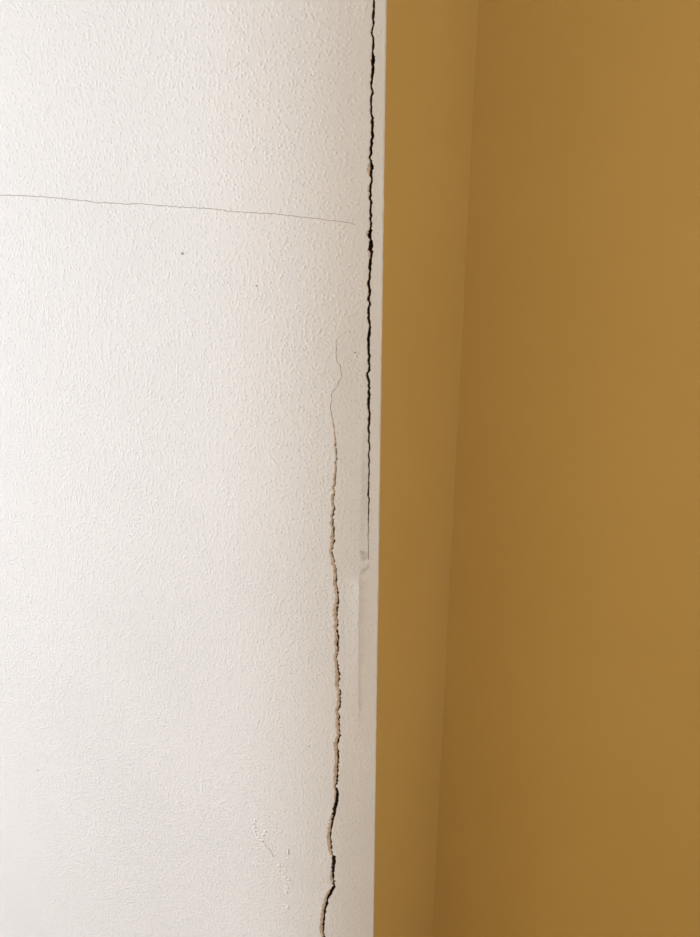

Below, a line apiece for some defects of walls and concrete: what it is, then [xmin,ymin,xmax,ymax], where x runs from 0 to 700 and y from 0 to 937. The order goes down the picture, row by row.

crack [0,0,375,559]
crack [319,334,343,937]